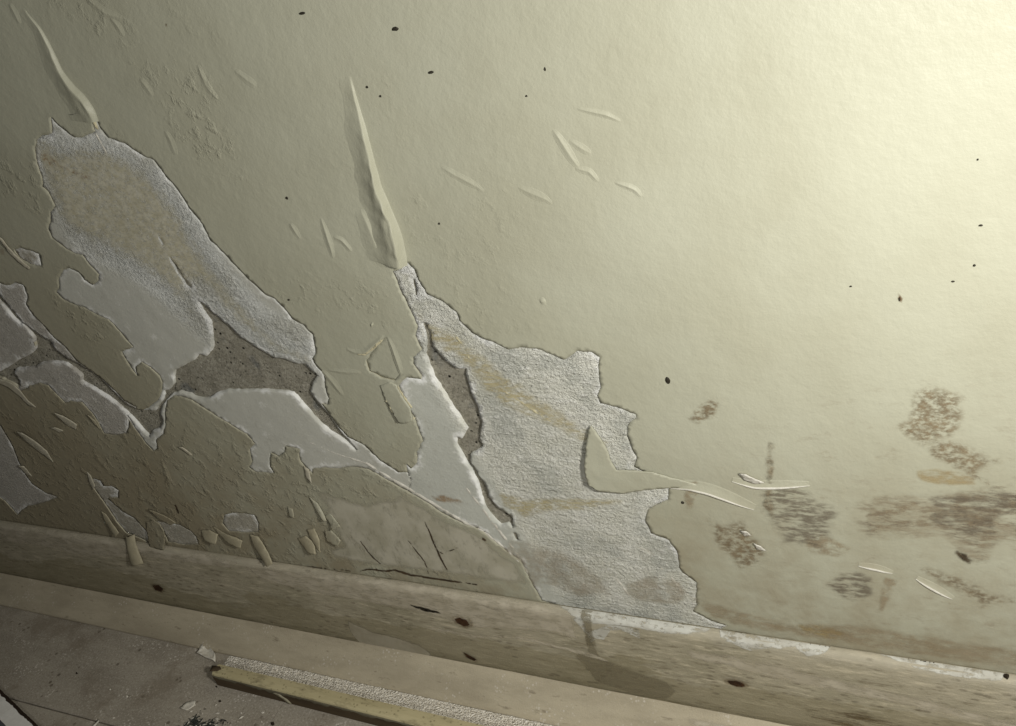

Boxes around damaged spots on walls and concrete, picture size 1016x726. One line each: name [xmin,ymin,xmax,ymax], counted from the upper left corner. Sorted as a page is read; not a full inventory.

peeling [0,118,829,661]
damp [907,393,982,484]
damp [716,527,760,565]
damp [766,490,831,553]
damp [870,494,1016,546]
damp [831,575,870,597]
peeling [691,652,1016,726]